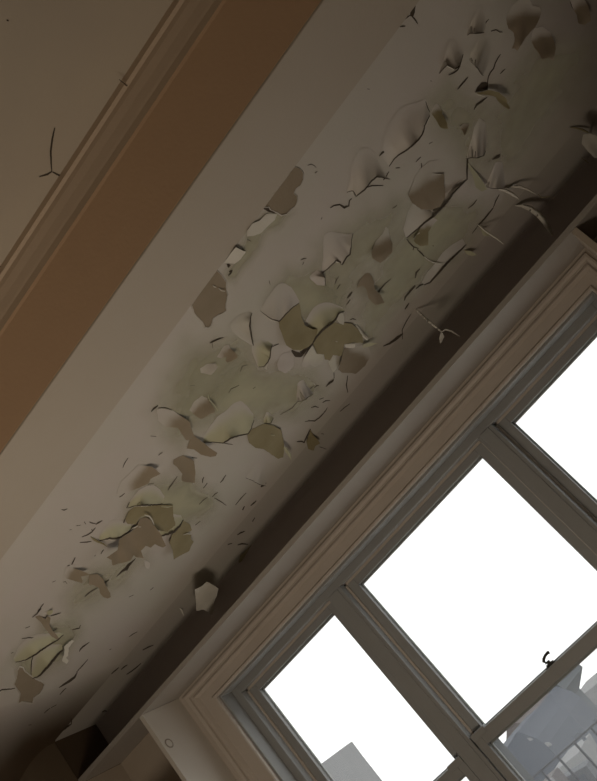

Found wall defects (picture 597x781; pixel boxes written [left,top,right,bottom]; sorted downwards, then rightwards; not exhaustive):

peeling [506,0,556,60]
crack [39,128,60,177]
flaking render [247,166,304,241]
peeling [408,160,445,246]
flaking render [191,270,229,329]
peeling [272,304,378,374]
peeling [151,395,218,483]
peeling [247,424,292,460]
peeling [107,505,194,569]
peeling [195,582,218,615]
peeling [33,603,74,664]
flaking render [14,666,45,704]